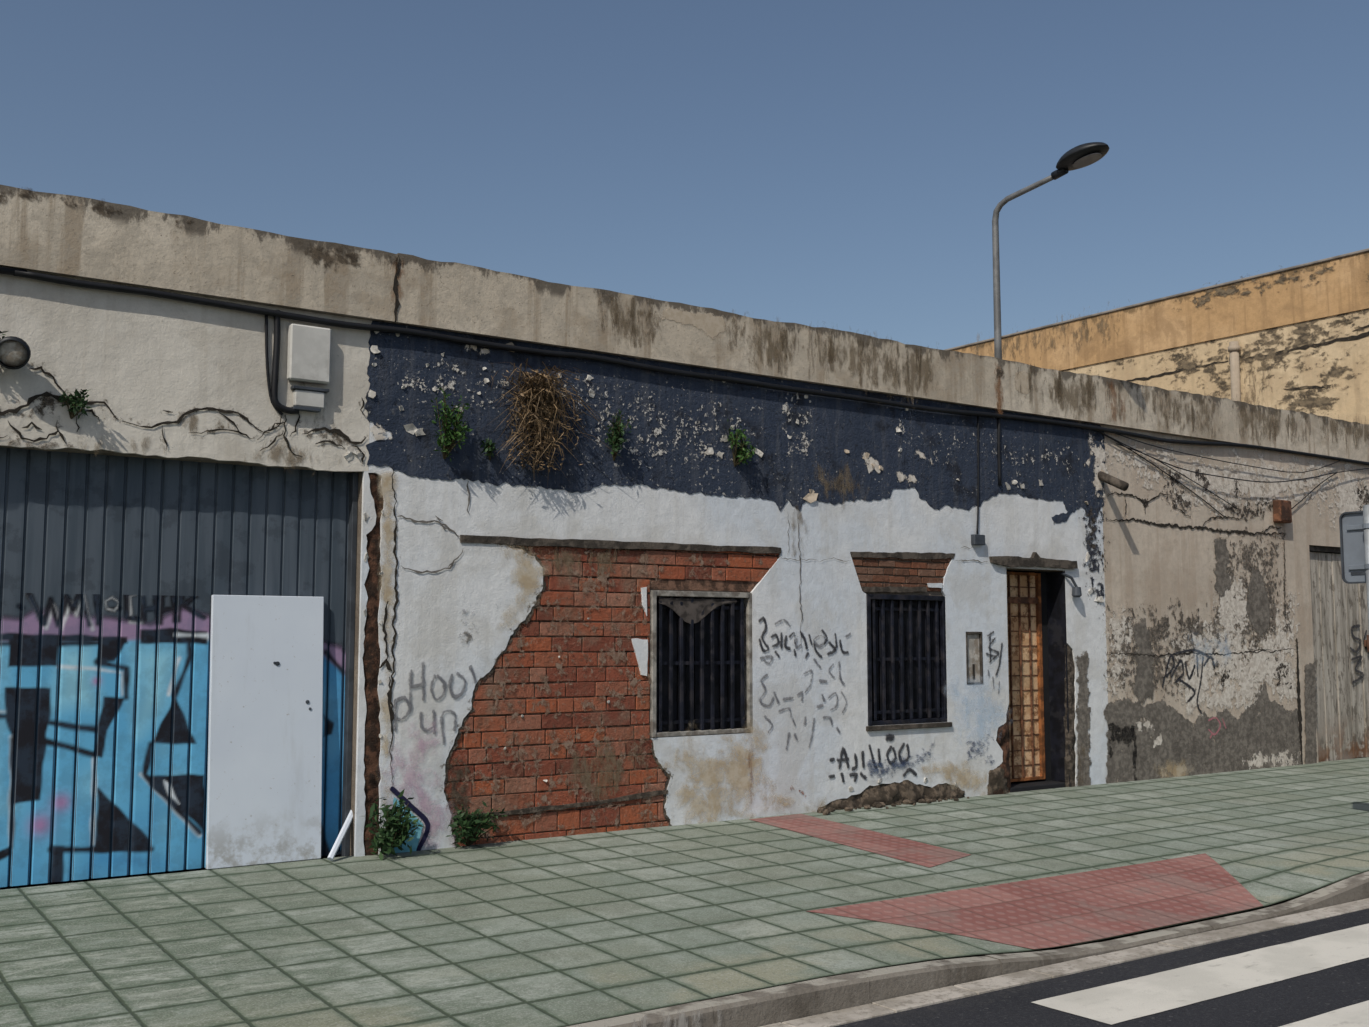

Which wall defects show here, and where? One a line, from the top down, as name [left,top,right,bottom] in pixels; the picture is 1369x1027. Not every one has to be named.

water stain [305,247,360,267]
water stain [1176,264,1335,309]
peeling [557,371,763,472]
peeling [782,392,917,503]
water stain [821,339,932,402]
water stain [1049,309,1369,447]
crack [1126,325,1369,381]
crack [1285,383,1331,391]
crack [0,364,470,784]
peeling [896,408,1369,795]
flaking render [442,538,779,847]
spalling [817,777,969,815]